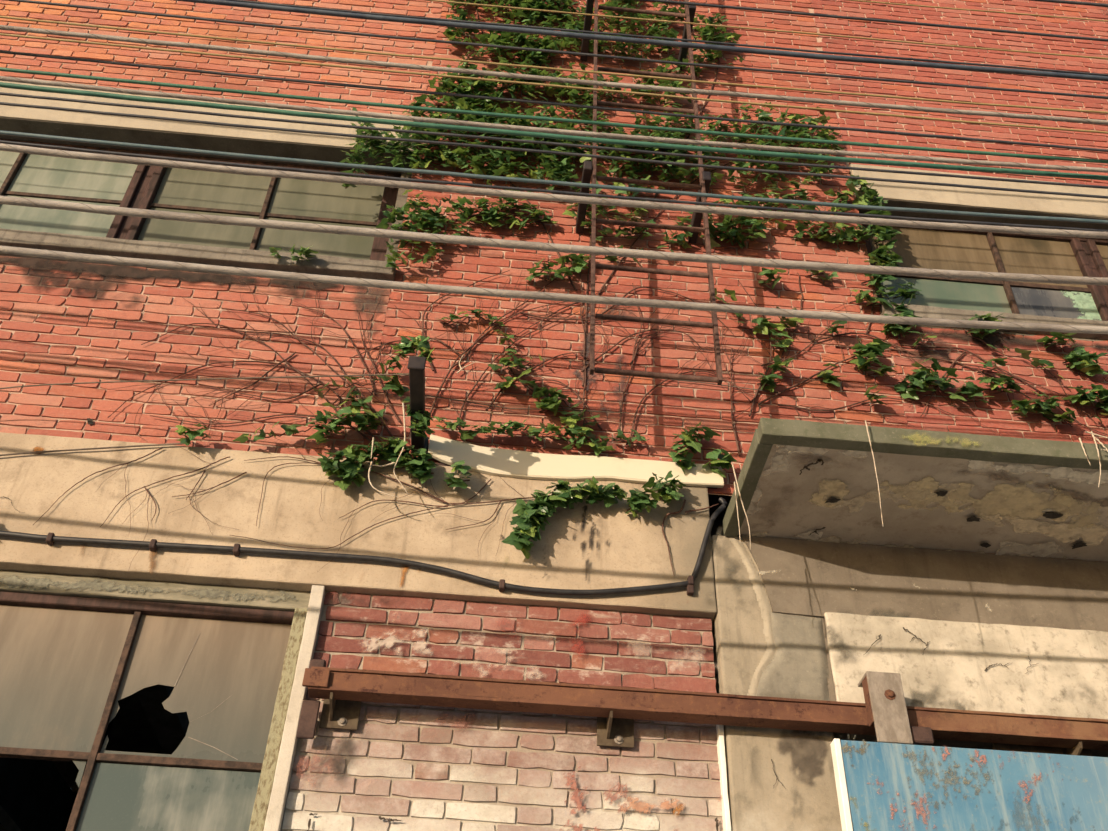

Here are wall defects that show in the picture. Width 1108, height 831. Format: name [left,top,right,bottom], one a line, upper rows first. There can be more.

damp [0,256,340,299]
peeling [762,445,867,475]
peeling [809,460,1108,558]
damp [573,506,608,578]
damp [779,730,826,783]
peeling [560,766,600,831]
peeling [603,783,683,815]